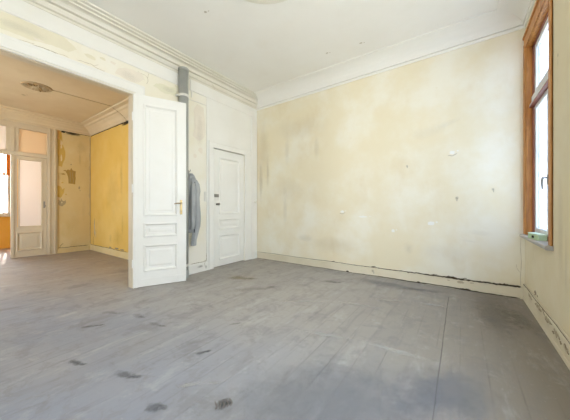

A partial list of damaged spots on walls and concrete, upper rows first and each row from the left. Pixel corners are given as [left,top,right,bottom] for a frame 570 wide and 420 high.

peeling [57,130,80,206]